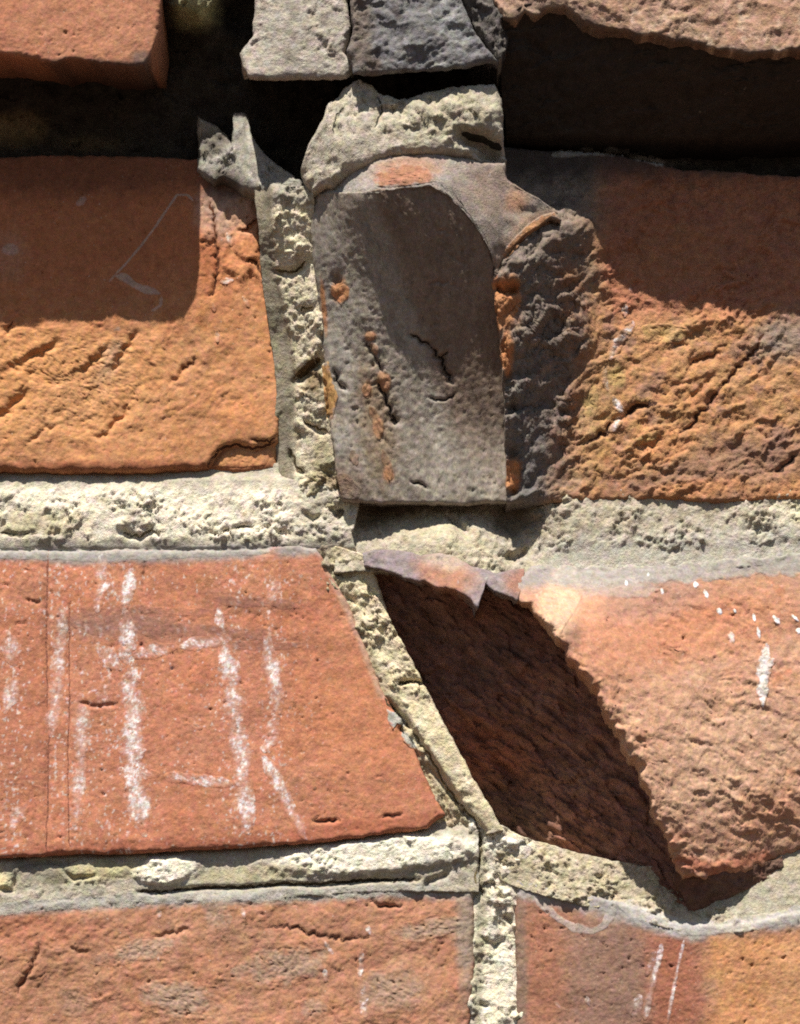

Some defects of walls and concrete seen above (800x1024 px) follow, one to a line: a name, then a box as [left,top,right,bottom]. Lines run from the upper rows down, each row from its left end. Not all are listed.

spalling [499,3,800,161]
crack [246,259,306,273]
crack [303,421,328,433]
crack [207,438,306,474]
spalling [362,549,695,910]